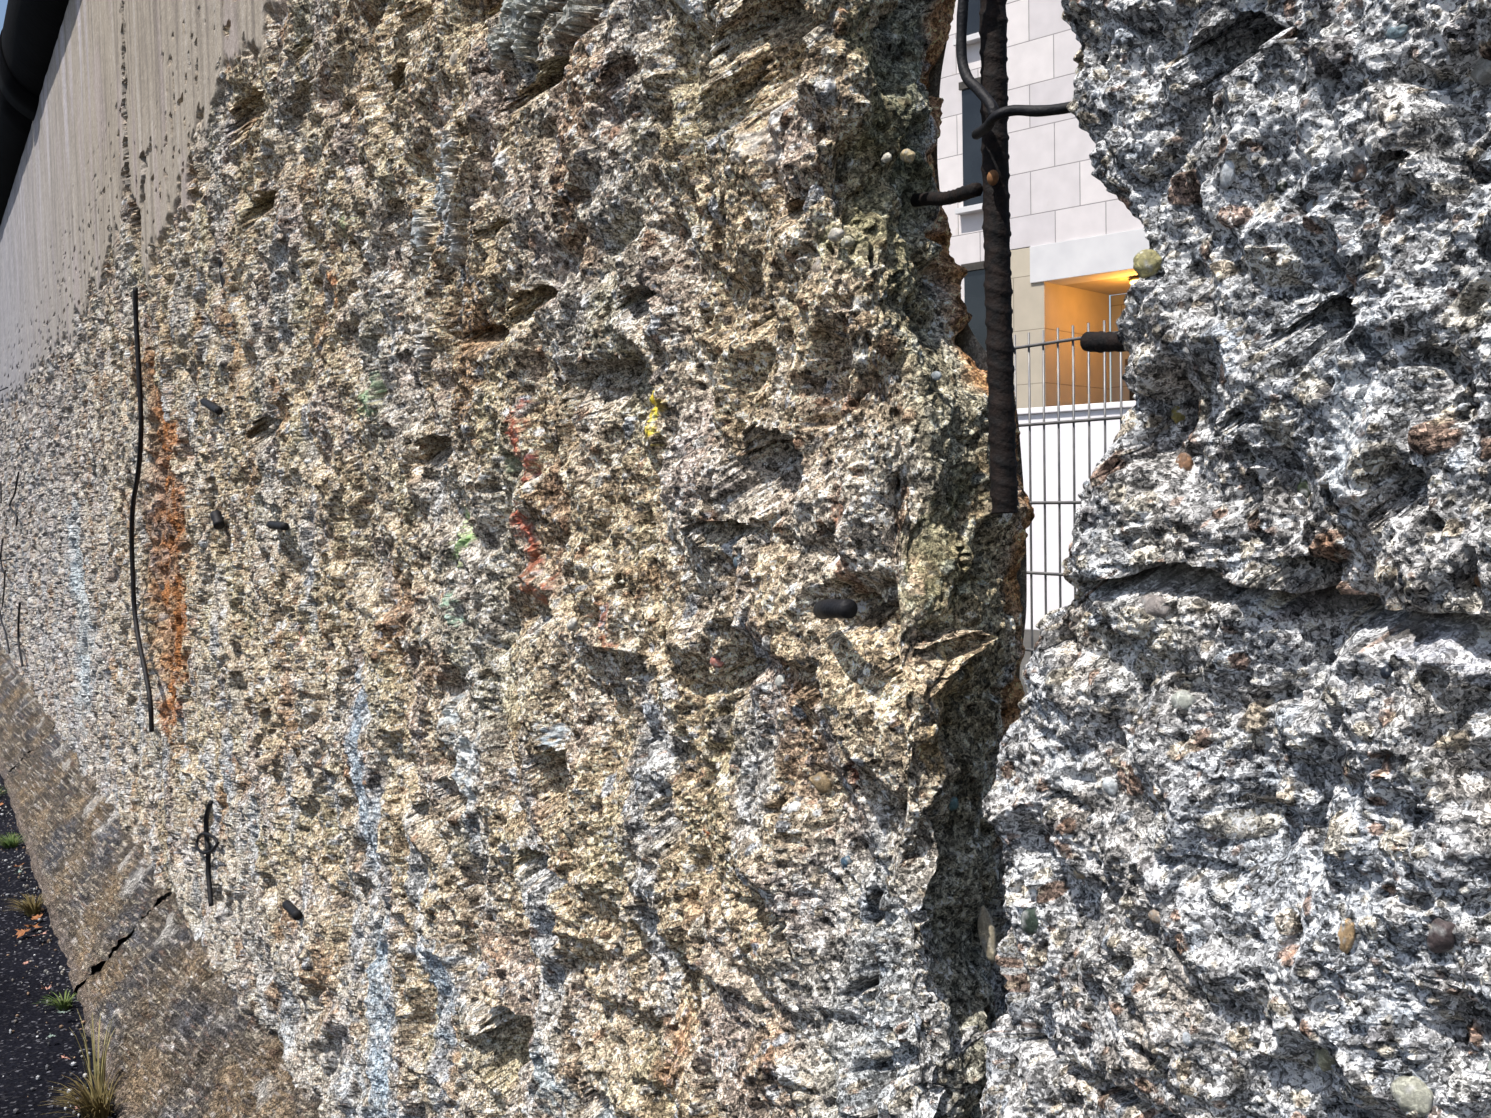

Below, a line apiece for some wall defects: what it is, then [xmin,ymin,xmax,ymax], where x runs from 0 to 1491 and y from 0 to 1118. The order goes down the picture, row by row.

corrosion [155,413,199,744]